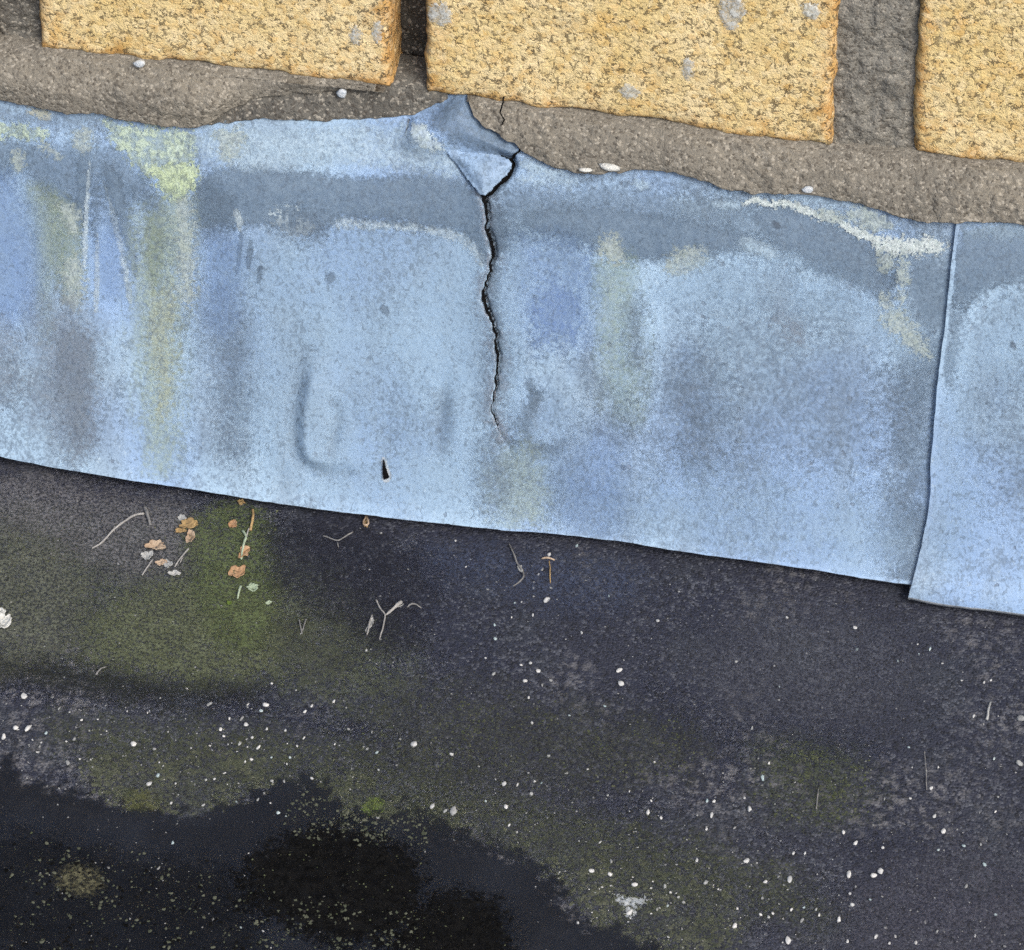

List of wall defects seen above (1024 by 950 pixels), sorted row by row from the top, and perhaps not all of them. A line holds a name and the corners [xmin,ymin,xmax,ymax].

crack [498,96,506,125]
crack [446,149,521,444]
water stain [0,95,1024,579]